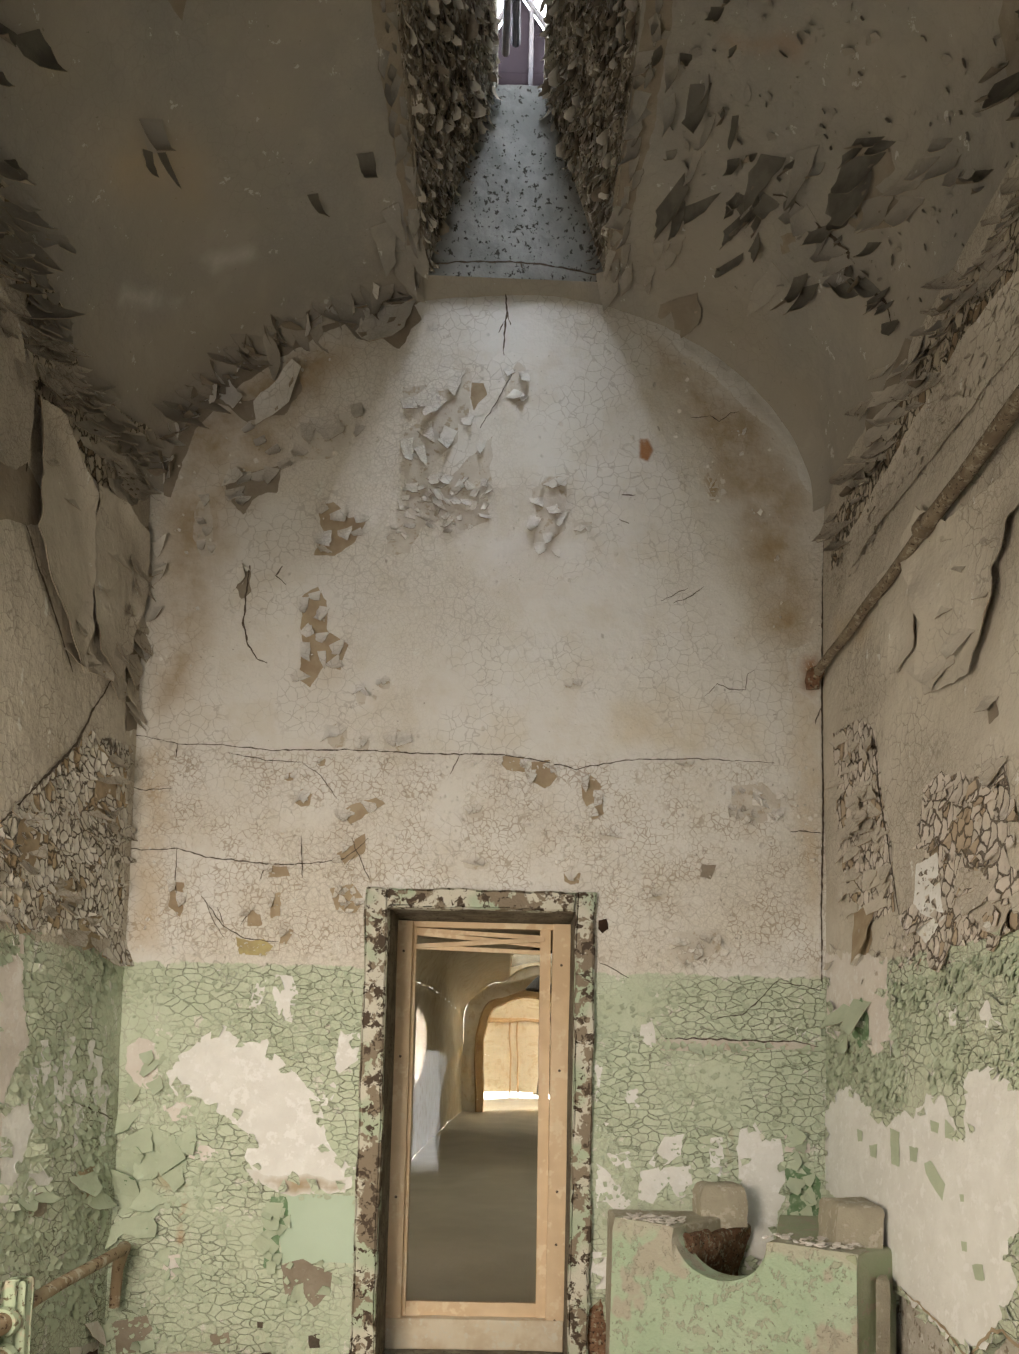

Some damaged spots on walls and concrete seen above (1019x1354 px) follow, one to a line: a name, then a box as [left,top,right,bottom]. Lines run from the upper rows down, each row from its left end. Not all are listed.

peeling [503,351,530,403]
flaking render [536,0,1019,598]
peeling [512,476,592,557]
peeling [876,455,1019,695]
peeling [973,696,999,724]
peeling [587,719,1019,1354]